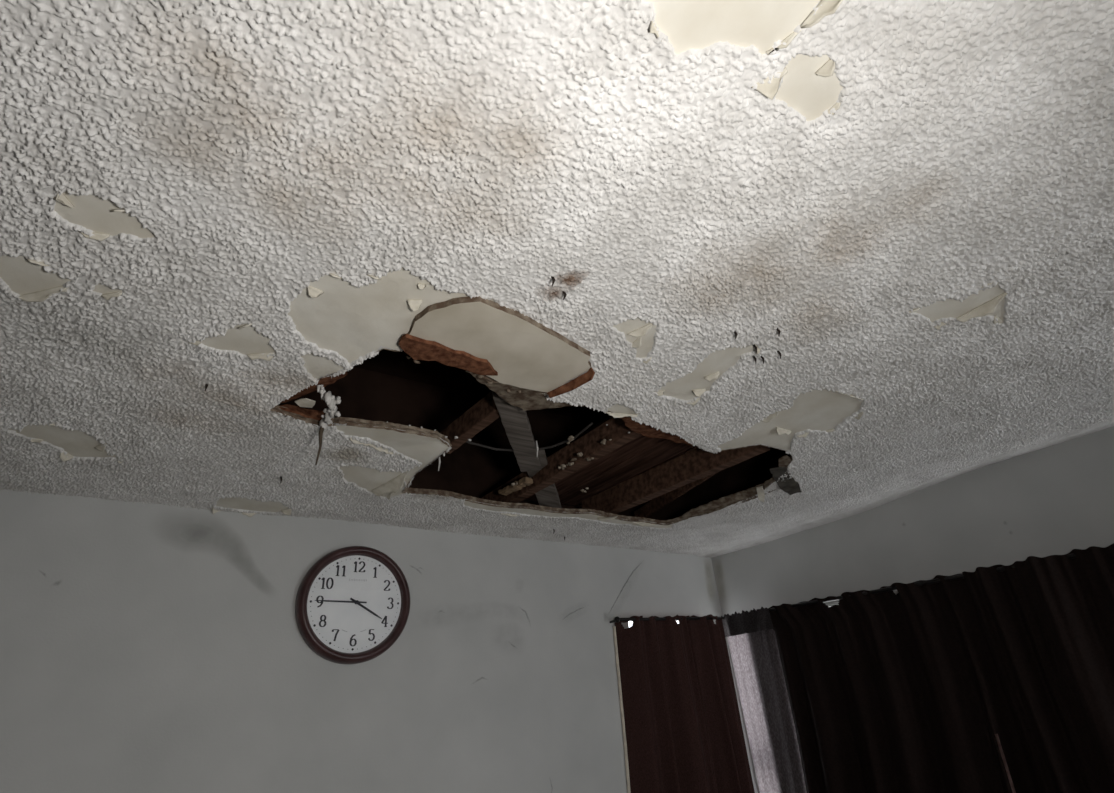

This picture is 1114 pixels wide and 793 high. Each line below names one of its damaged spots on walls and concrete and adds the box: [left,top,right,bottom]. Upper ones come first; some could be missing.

peeling [642,0,843,121]
peeling [54,191,155,241]
peeling [288,267,469,379]
peeling [613,317,657,364]
peeling [909,282,1008,330]
peeling [606,404,639,418]
peeling [718,389,864,450]
peeling [335,425,448,486]
peeling [463,499,672,540]